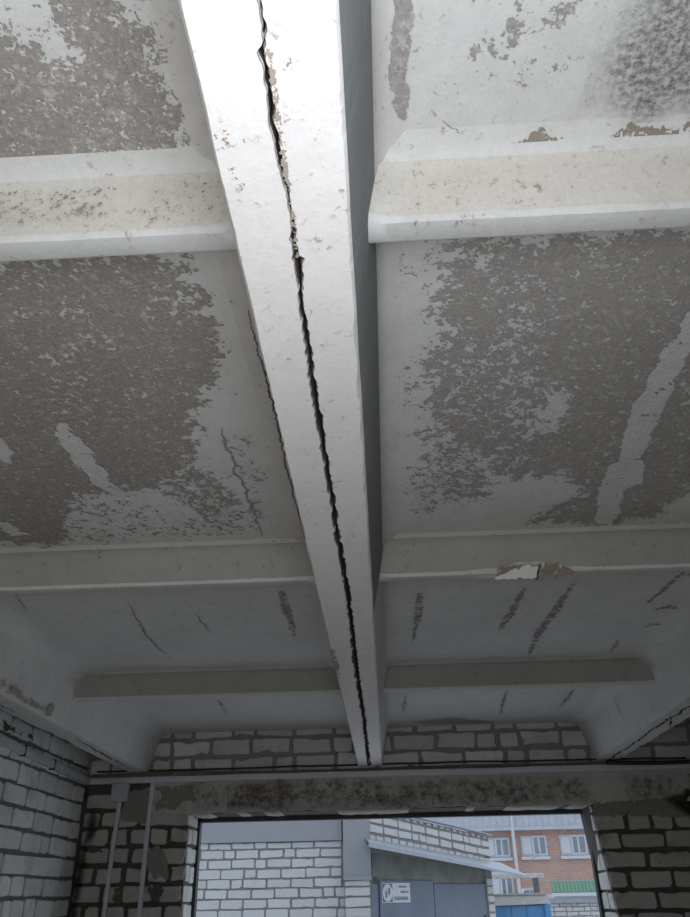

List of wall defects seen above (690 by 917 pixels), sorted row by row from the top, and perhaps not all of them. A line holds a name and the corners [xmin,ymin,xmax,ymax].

peeling [0,0,191,158]
peeling [388,0,415,120]
spalling [518,127,563,143]
spalling [610,121,690,138]
mould [616,0,690,110]
peeling [0,253,267,549]
crack [221,428,262,536]
crack [248,310,305,538]
crack [257,0,371,766]
peeling [398,228,690,528]
crack [412,593,424,640]
crack [609,706,690,760]